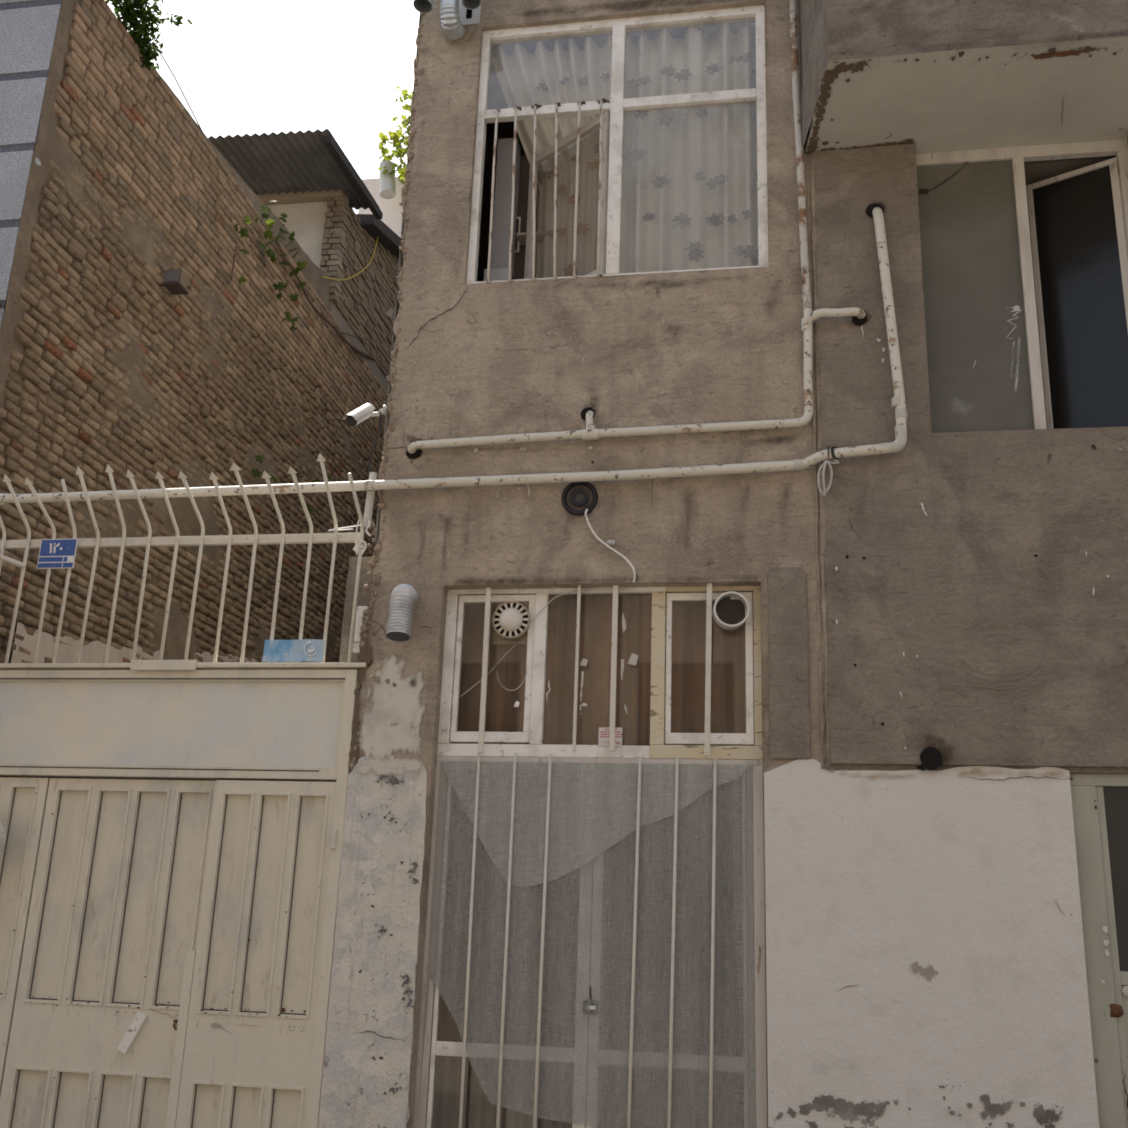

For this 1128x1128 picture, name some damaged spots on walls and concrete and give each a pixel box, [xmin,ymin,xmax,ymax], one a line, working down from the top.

corrosion [1033,50,1085,59]
crack [388,287,467,369]
peeling [318,13,427,1128]
peeling [910,962,938,981]
peeling [776,1095,911,1128]
peeling [939,1085,1064,1128]